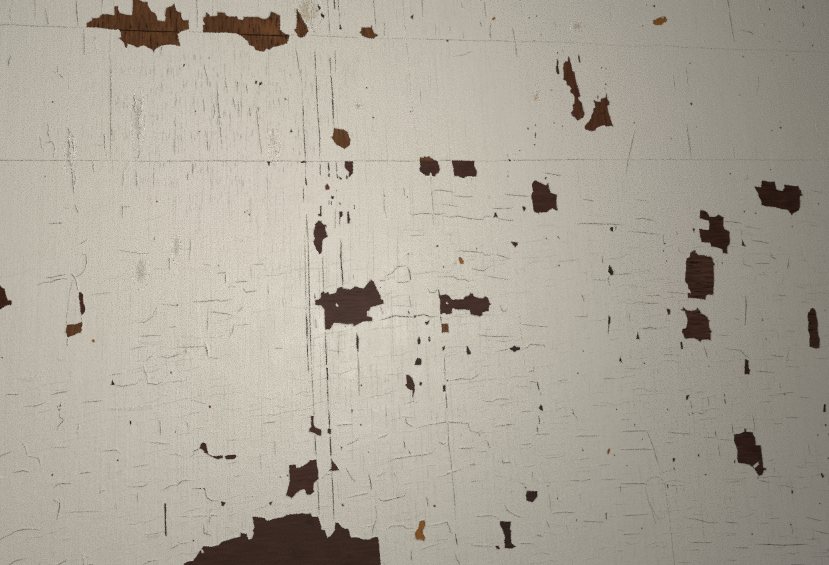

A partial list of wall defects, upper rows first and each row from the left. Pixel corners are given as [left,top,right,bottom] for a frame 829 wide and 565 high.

peeling [85,0,190,54]
peeling [201,8,314,53]
crack [373,0,822,90]
crack [382,124,829,242]
crack [0,0,568,565]
peeling [314,278,385,354]
peeling [666,209,731,350]
crack [602,290,829,431]
peeling [280,457,341,500]
crack [519,390,732,555]
peeling [183,512,382,565]
crack [677,516,829,565]